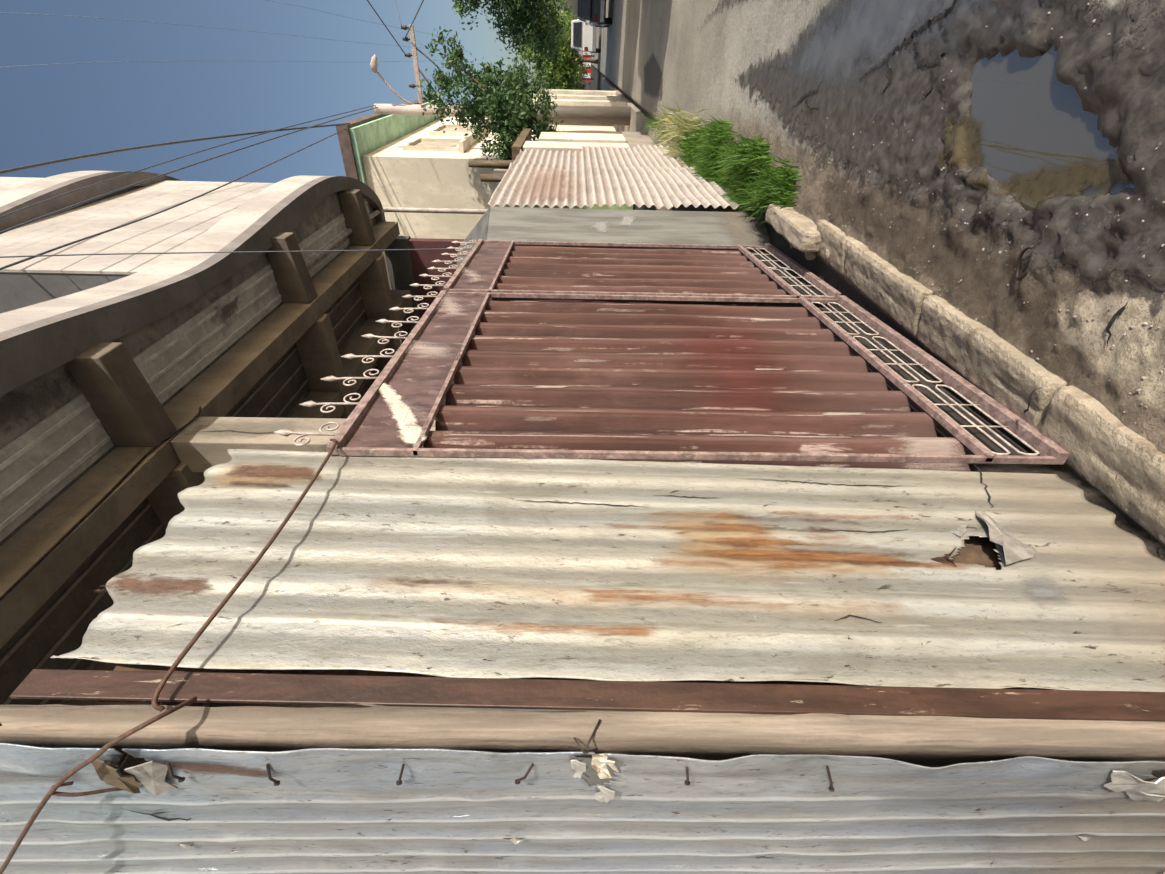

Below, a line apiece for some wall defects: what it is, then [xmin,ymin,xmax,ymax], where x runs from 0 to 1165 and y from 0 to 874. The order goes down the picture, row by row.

crack [857,0,956,100]
crack [794,78,823,111]
damp [735,0,1165,351]
damp [726,214,762,244]
corrosion [684,513,959,568]
corrosion [587,590,719,603]
corrosion [497,624,648,635]
peeling [92,760,178,796]
peeling [1104,770,1165,802]